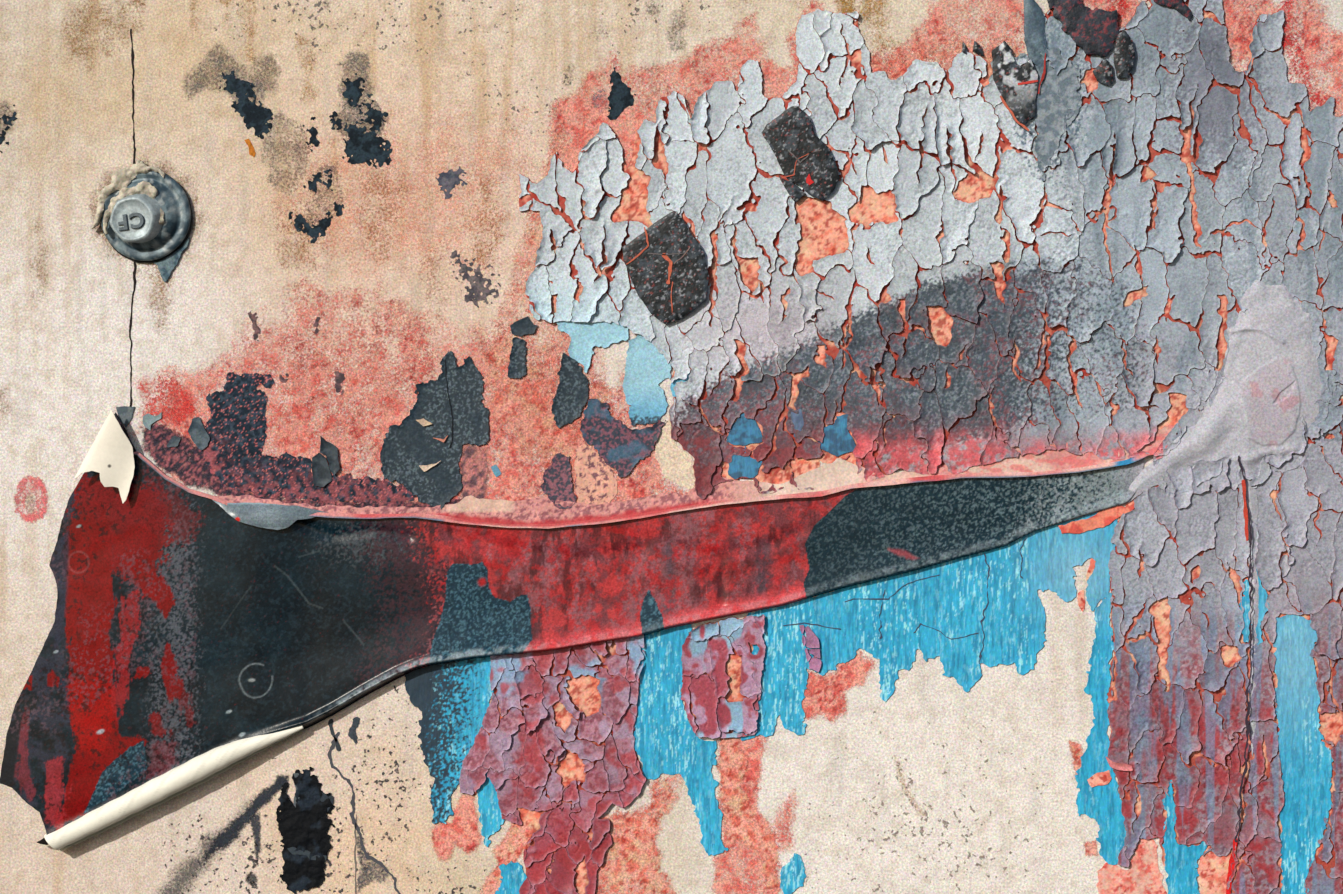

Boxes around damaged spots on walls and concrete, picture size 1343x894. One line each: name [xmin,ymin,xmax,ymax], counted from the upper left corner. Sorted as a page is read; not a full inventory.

crack [129,29,137,164]
crack [129,262,137,407]
peeling [166,417,210,450]
peeling [248,311,260,341]
peeling [312,436,340,487]
peeling [334,371,345,395]
peeling [508,0,1343,894]
spalling [276,767,335,894]
crack [327,719,401,894]
peeling [459,635,647,894]